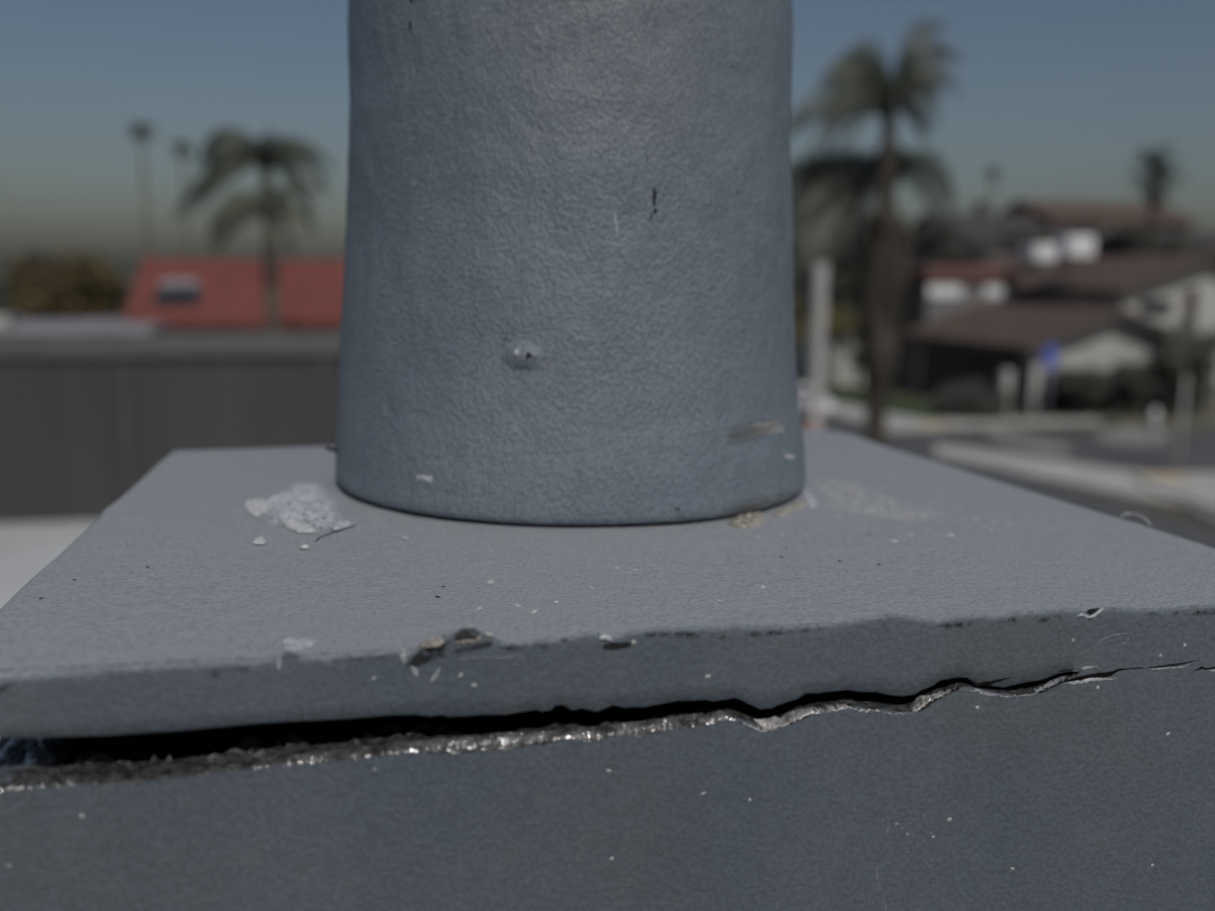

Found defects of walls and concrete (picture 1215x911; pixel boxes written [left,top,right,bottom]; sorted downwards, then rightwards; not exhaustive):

peeling [244,483,356,549]
peeling [401,628,493,682]
crack [0,660,1215,792]